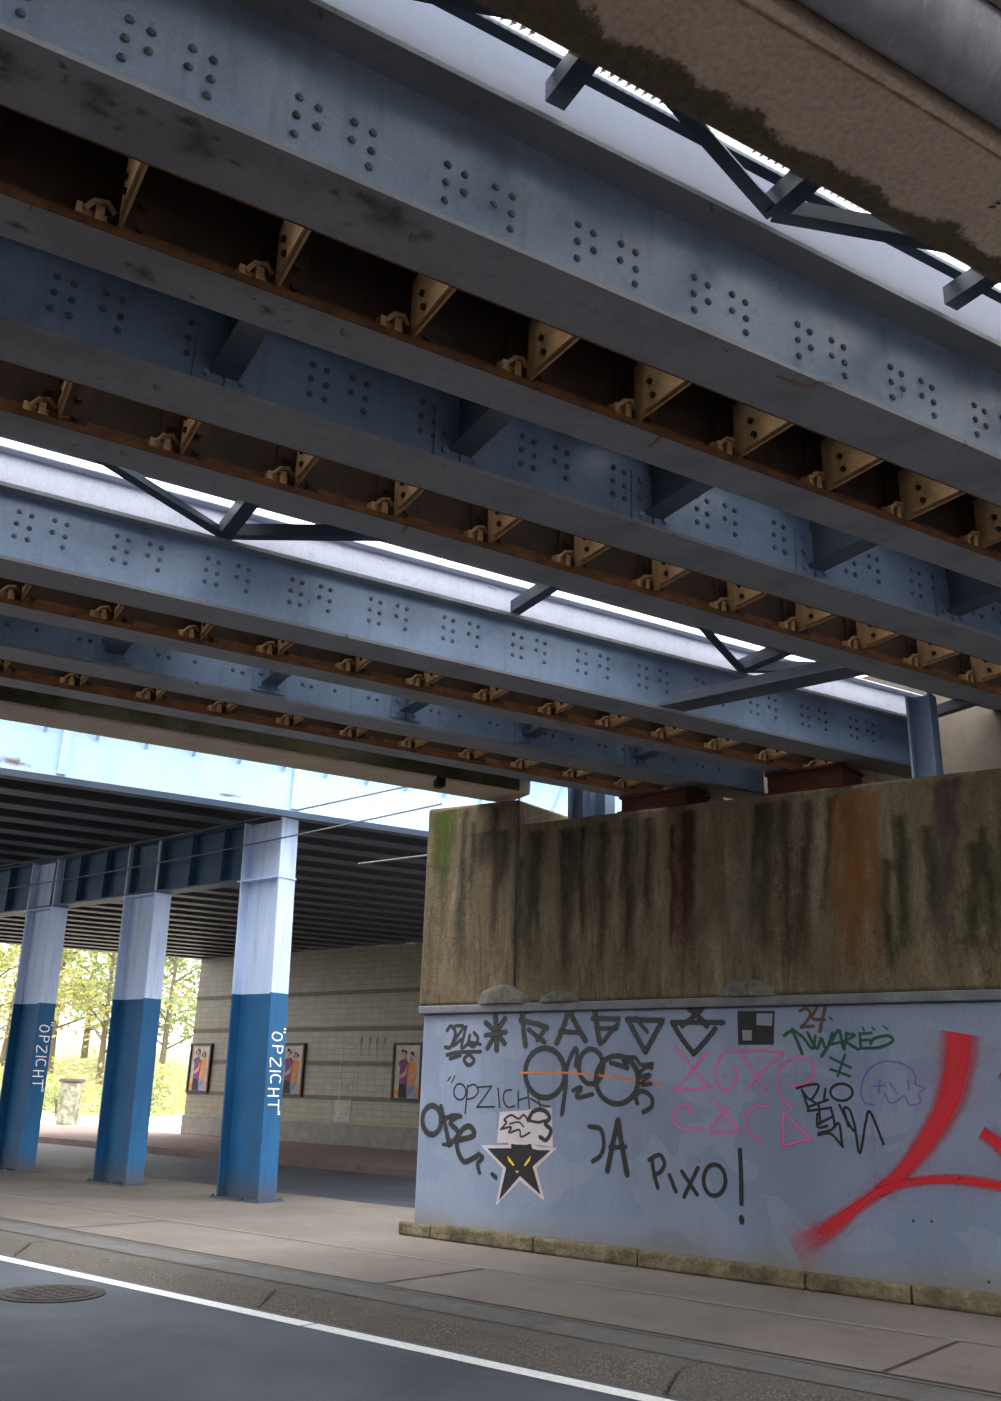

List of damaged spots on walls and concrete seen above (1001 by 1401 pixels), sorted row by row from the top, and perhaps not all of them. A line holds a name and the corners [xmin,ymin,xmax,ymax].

water stain [471,0,1001,285]
water stain [434,809,543,944]
water stain [560,818,653,946]
water stain [749,798,833,938]
water stain [883,816,908,943]
water stain [923,779,1001,934]